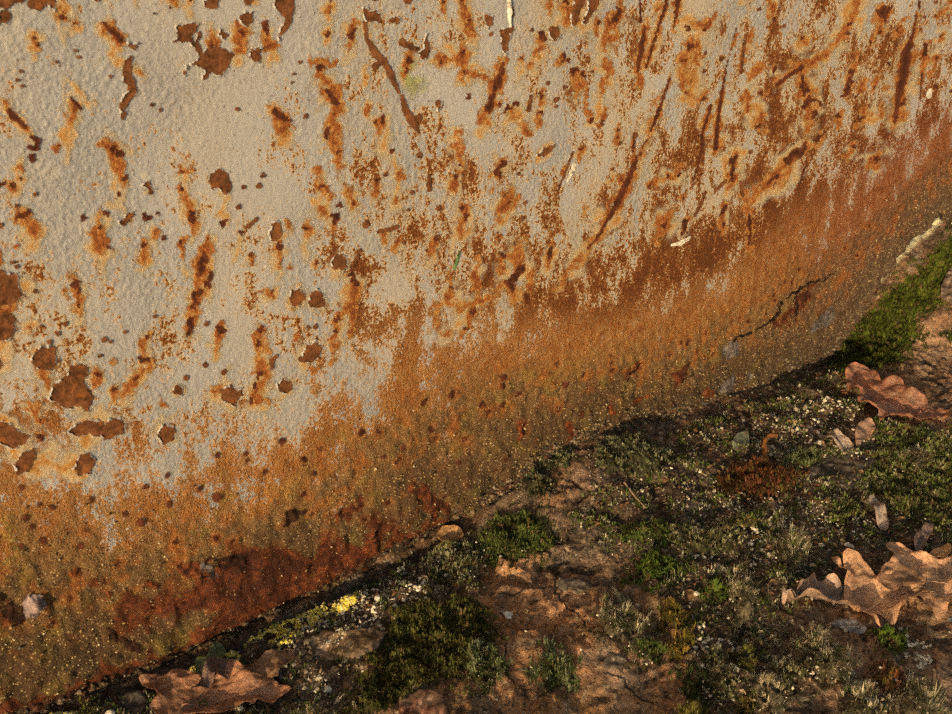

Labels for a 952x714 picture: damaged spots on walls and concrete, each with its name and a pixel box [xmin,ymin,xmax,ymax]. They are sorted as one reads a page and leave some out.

rust [0,78,97,253]
peeling [171,0,235,80]
peeling [249,47,263,64]
rust [135,10,415,414]
peeling [273,0,296,41]
rust [398,0,638,347]
rust [672,11,720,110]
rust [645,146,757,264]
rust [736,0,952,174]
rust [0,251,157,483]
crack [731,271,839,343]
rust [0,478,450,714]